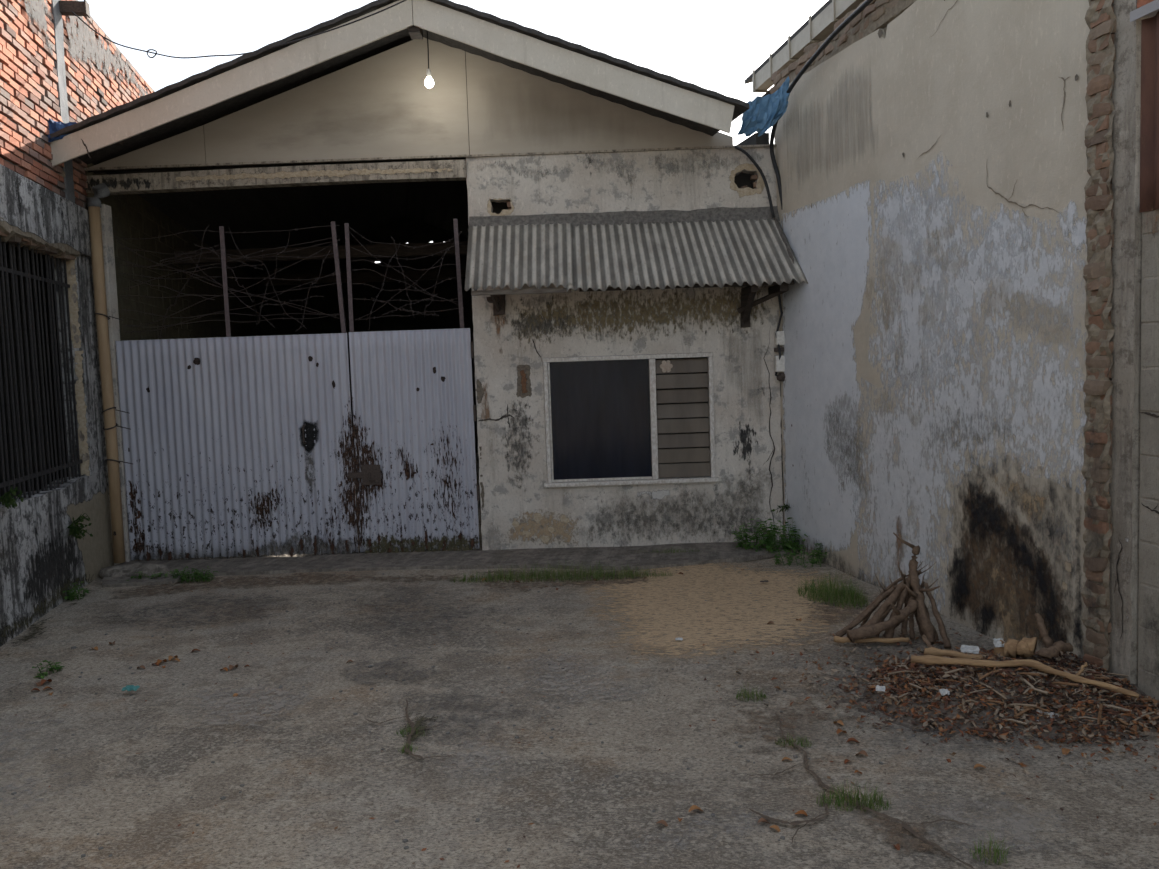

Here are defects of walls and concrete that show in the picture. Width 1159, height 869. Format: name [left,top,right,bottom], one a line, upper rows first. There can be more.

crack [1059,77,1069,125]
crack [986,164,1060,216]
peeling [781,0,1117,667]
damp [0,514,80,608]
corrosion [126,480,150,555]
corrosion [248,485,286,535]
corrosion [315,397,474,554]
damp [505,402,533,487]
damp [509,511,576,545]
damp [590,423,760,539]